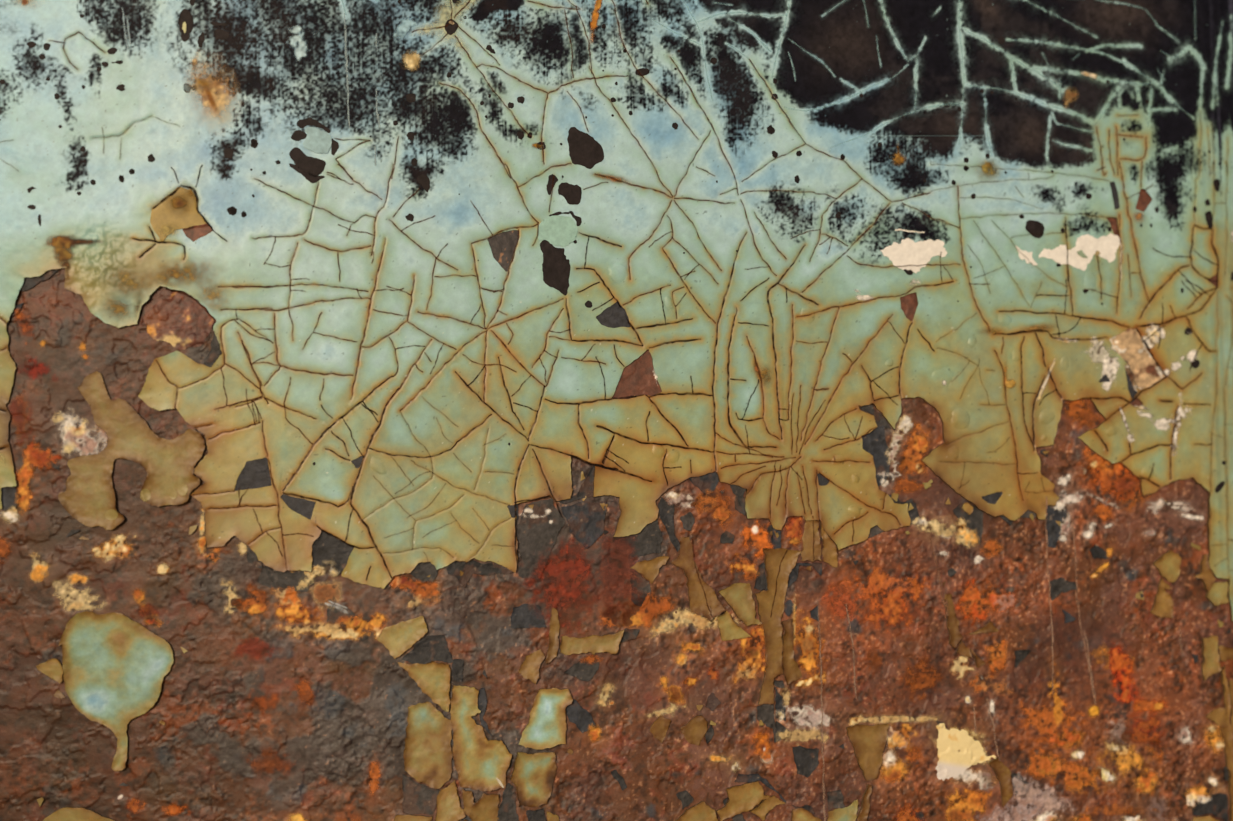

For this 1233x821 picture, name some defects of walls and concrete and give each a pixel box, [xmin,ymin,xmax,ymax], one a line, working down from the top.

crack [54,31,104,68]
damp [77,0,155,85]
damp [67,138,88,190]
peeling [517,116,604,169]
damp [171,0,1233,258]
peeling [487,230,519,272]
peeling [540,174,582,296]
rust [109,265,220,350]
crack [132,0,1219,618]
peeling [0,268,1233,821]
rust [235,582,386,640]
rust [1020,680,1099,790]